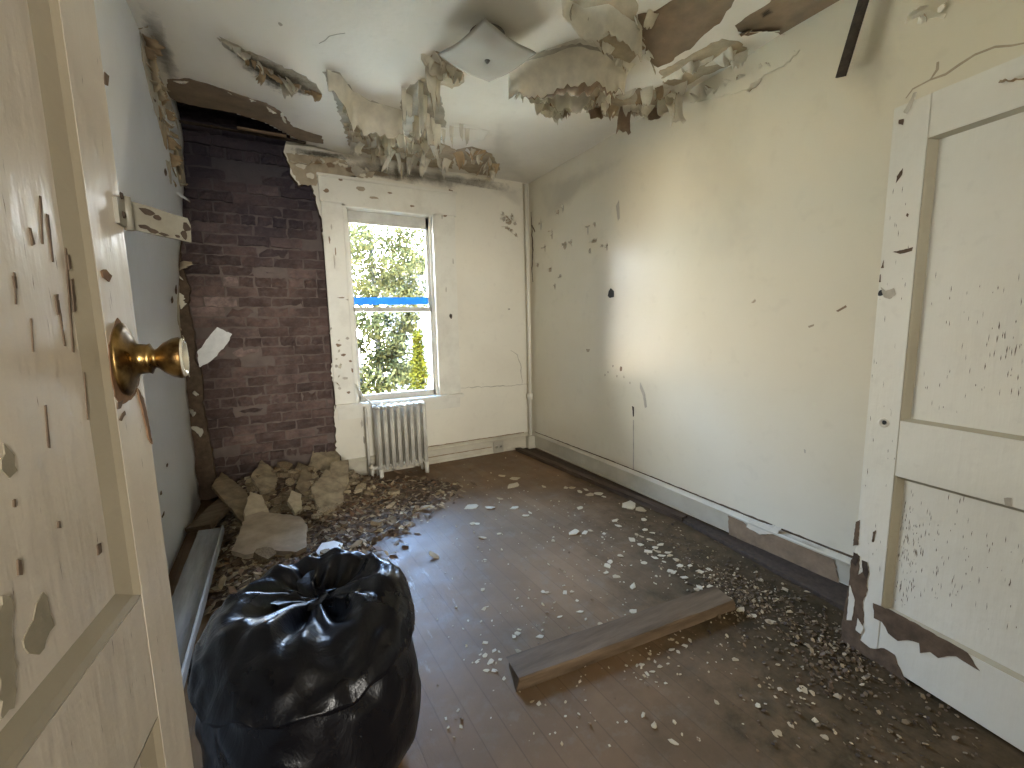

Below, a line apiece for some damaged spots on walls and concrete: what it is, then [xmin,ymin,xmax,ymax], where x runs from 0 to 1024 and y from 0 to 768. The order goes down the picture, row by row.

peeling [507,0,839,135]
crack [906,42,1024,98]
flaking render [138,26,500,500]
peeling [728,516,980,682]